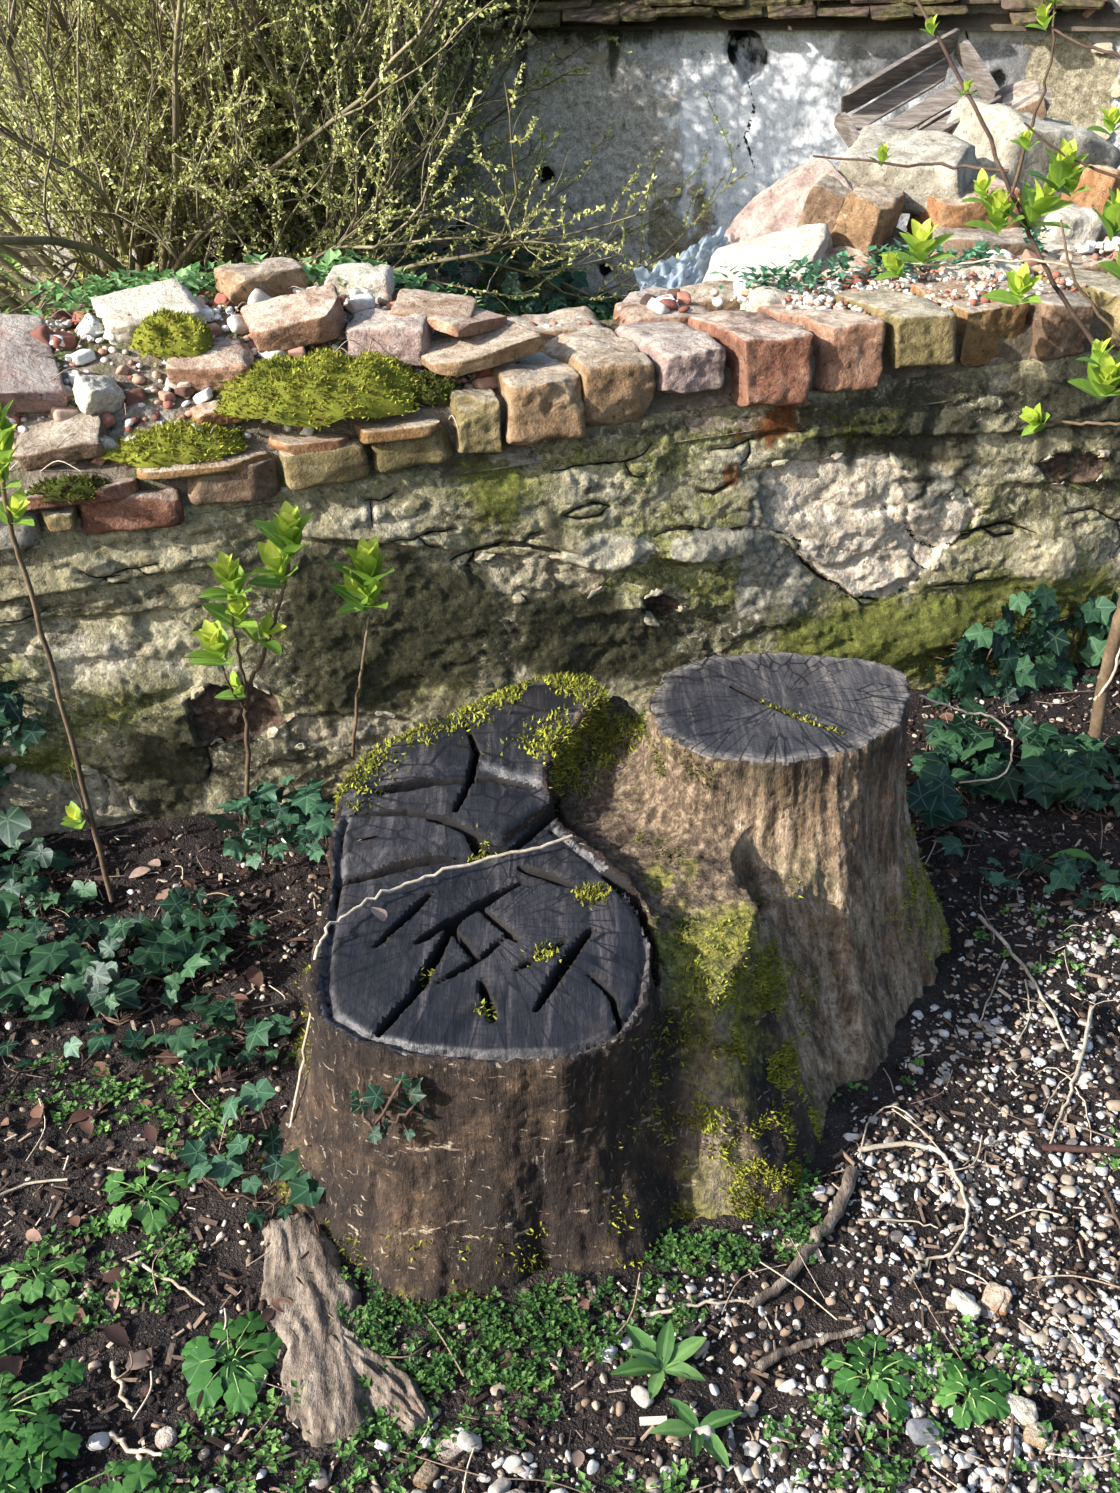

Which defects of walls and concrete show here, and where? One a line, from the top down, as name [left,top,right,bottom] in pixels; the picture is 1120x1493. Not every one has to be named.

spalling [727,30,768,71]
crack [733,81,755,169]
crack [653,430,1036,607]
crack [1066,508,1120,556]